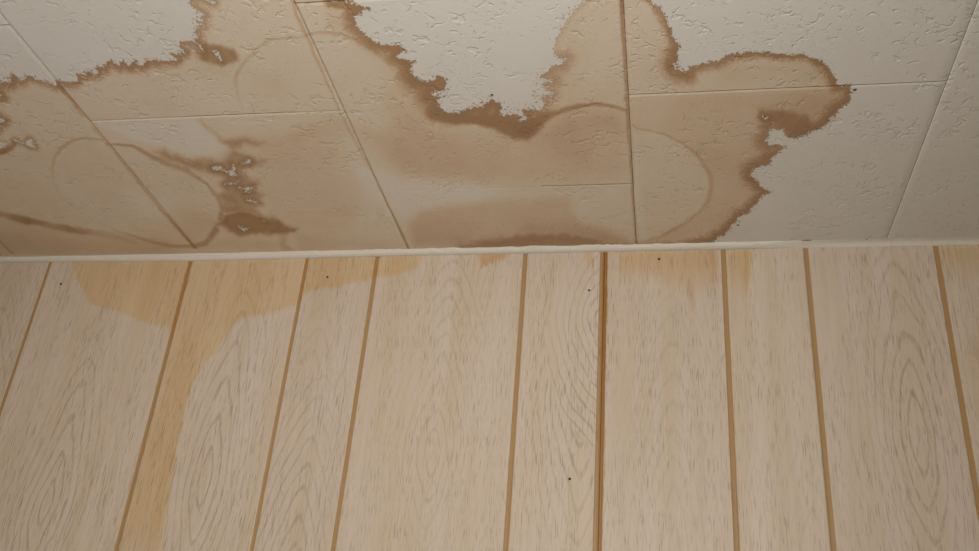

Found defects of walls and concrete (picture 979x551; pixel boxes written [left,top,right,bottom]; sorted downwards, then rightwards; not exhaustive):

damp [0,0,853,346]
damp [59,255,439,551]